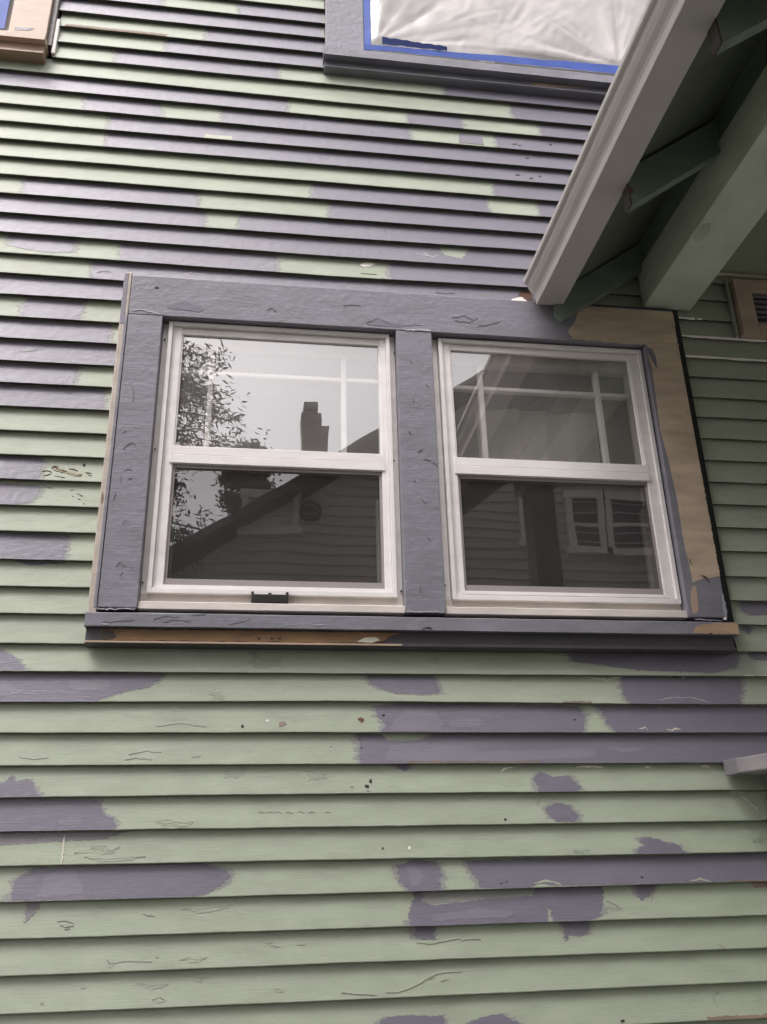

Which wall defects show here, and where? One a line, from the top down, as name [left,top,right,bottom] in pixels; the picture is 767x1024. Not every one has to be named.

peeling [101,623,403,643]